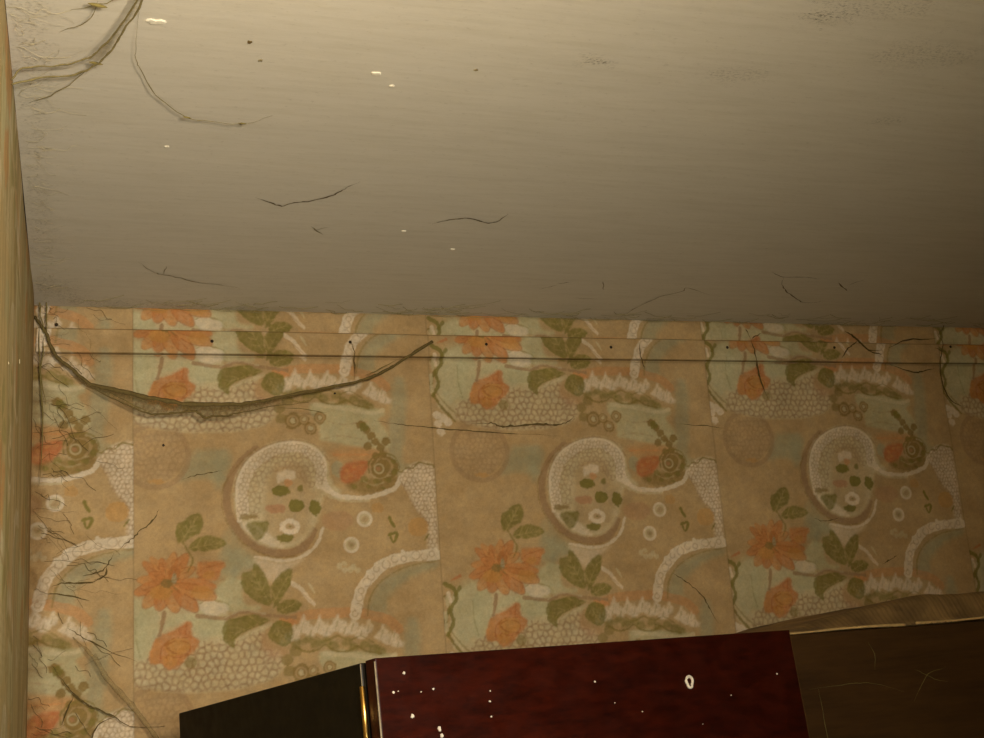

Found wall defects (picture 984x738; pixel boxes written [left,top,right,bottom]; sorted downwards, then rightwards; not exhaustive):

crack [255,182,359,207]
crack [374,419,571,436]
crack [49,511,158,601]
crack [67,628,135,661]